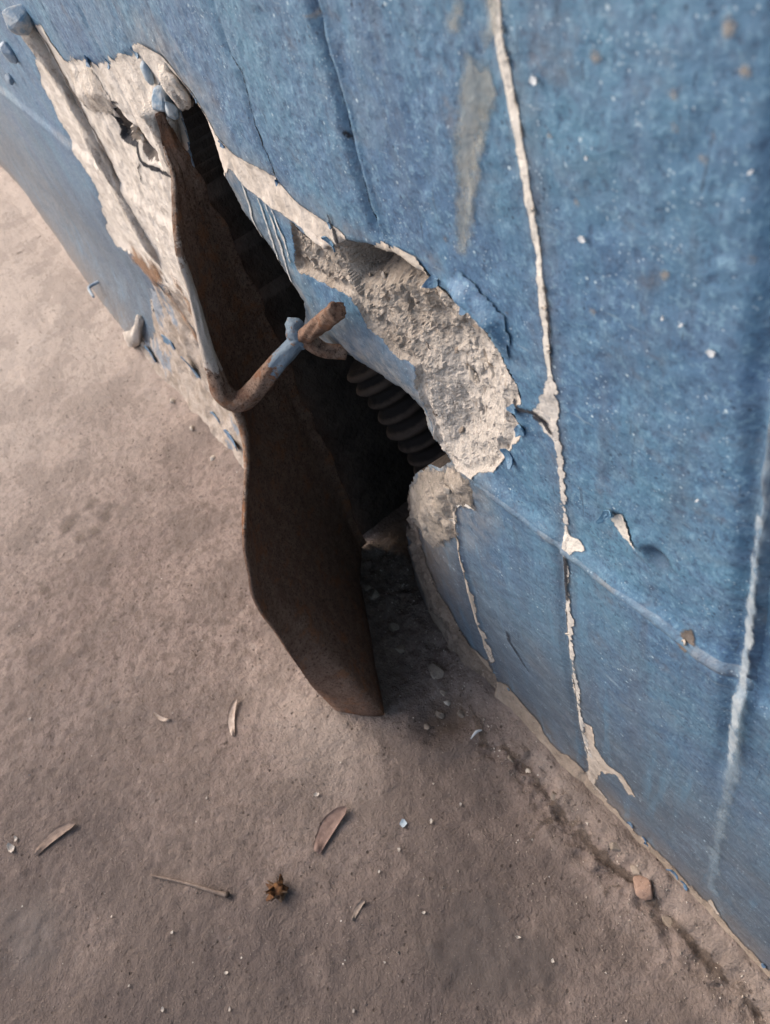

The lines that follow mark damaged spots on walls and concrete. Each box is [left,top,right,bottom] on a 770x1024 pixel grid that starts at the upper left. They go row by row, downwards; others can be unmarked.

rust [132,248,197,340]
flaking render [35,24,525,480]
rust [232,412,250,529]
crack [512,398,552,435]
peeling [406,0,770,978]
crack [562,557,570,601]